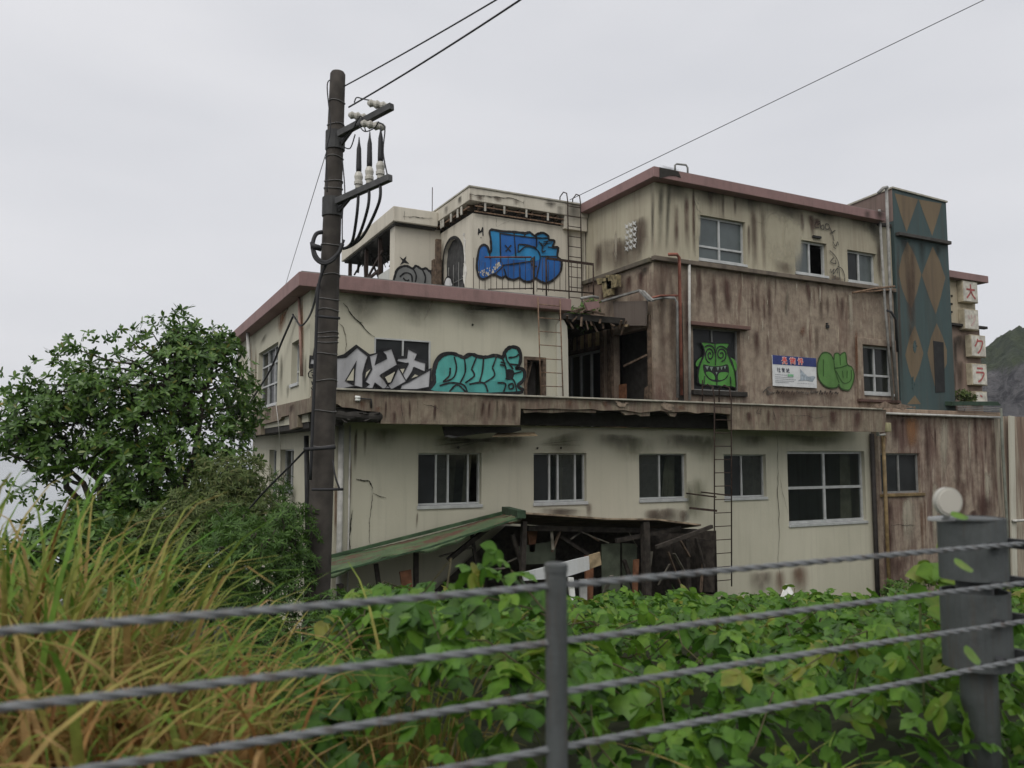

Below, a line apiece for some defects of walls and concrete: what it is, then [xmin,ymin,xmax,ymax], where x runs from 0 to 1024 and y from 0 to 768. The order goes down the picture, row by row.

leakage [596,194,669,268]
leakage [746,199,765,247]
crack [340,303,375,349]
corrosion [686,272,730,334]
crack [349,479,385,547]